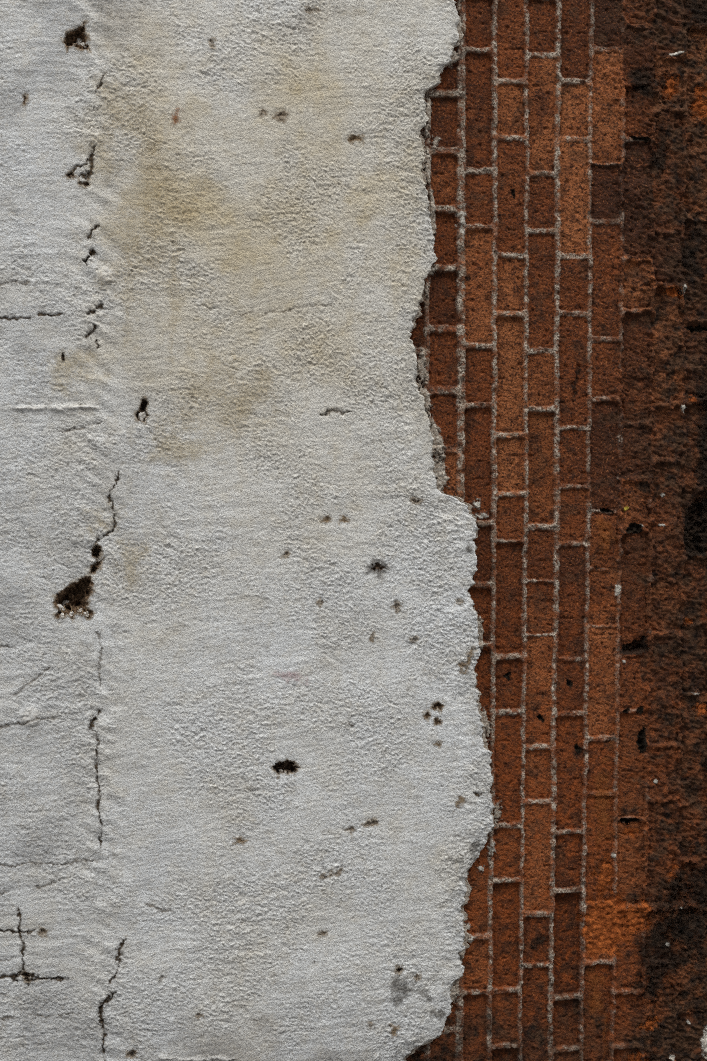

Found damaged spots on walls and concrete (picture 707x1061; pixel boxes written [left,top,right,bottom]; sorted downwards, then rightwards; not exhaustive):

spalling [411,2,479,554]
crack [93,472,119,569]
peeling [458,583,484,649]
spalling [423,701,444,726]
spalling [473,662,496,846]
crack [0,909,64,985]
crack [98,939,126,1053]
spalling [404,866,472,1061]
spalling [577,857,652,957]